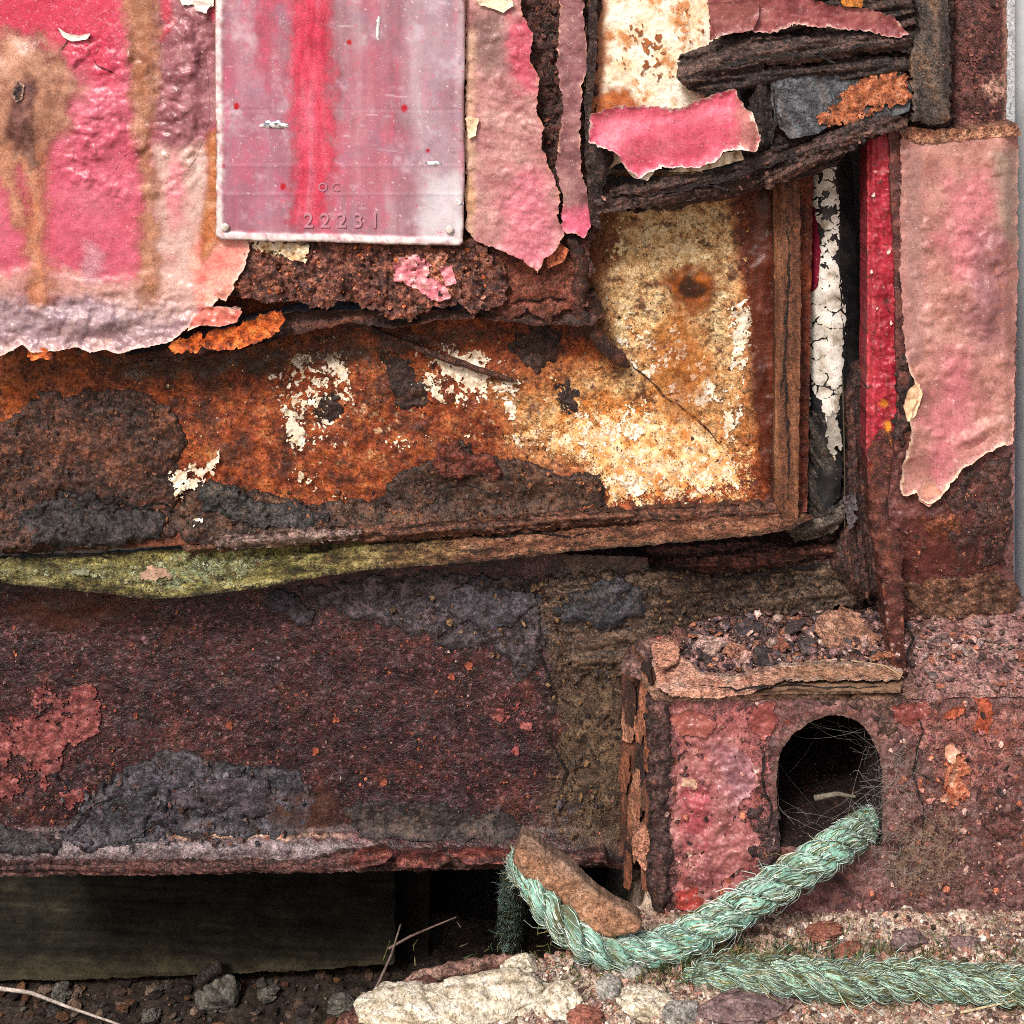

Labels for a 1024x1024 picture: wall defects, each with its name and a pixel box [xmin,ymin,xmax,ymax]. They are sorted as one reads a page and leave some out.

peeling [180,0,214,13]
peeling [12,81,25,102]
rust [816,71,913,127]
peeling [456,0,761,282]
peeling [188,283,242,331]
crack [838,184,851,417]
rust [27,348,55,361]
peeling [268,349,355,454]
rust [168,197,782,554]
crack [632,364,723,446]
peeling [887,135,1021,620]